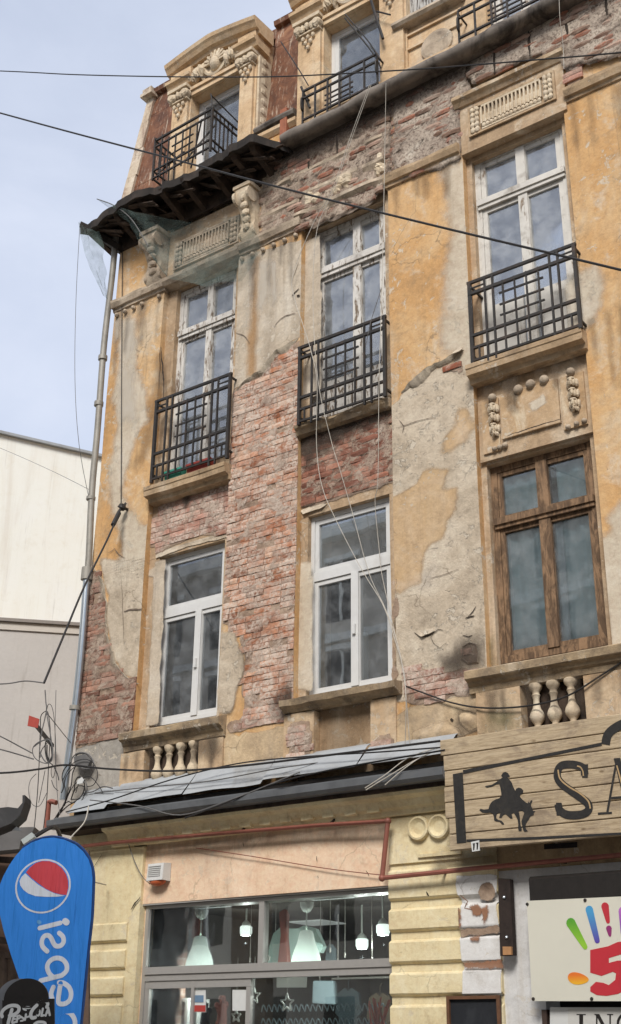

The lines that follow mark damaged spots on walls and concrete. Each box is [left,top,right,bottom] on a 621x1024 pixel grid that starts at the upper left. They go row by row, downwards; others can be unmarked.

flaking render [74,0,621,766]
crack [415,607,476,648]
peeling [456,874,504,996]